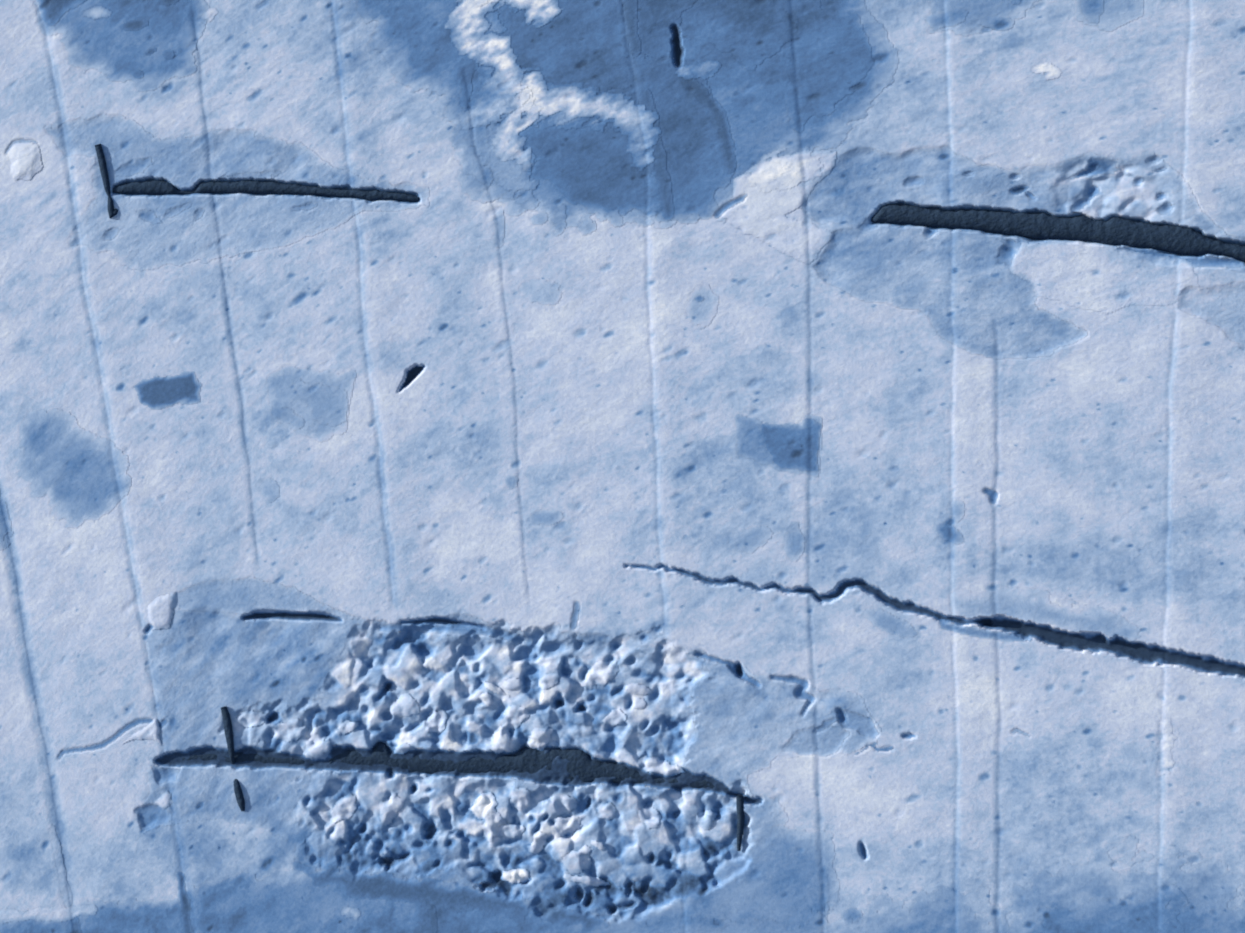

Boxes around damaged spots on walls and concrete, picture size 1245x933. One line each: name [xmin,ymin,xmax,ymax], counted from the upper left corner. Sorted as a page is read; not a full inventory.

leakage [34,0,218,92]
leakage [356,0,899,247]
crack [625,564,1245,678]
spalling [134,576,881,917]